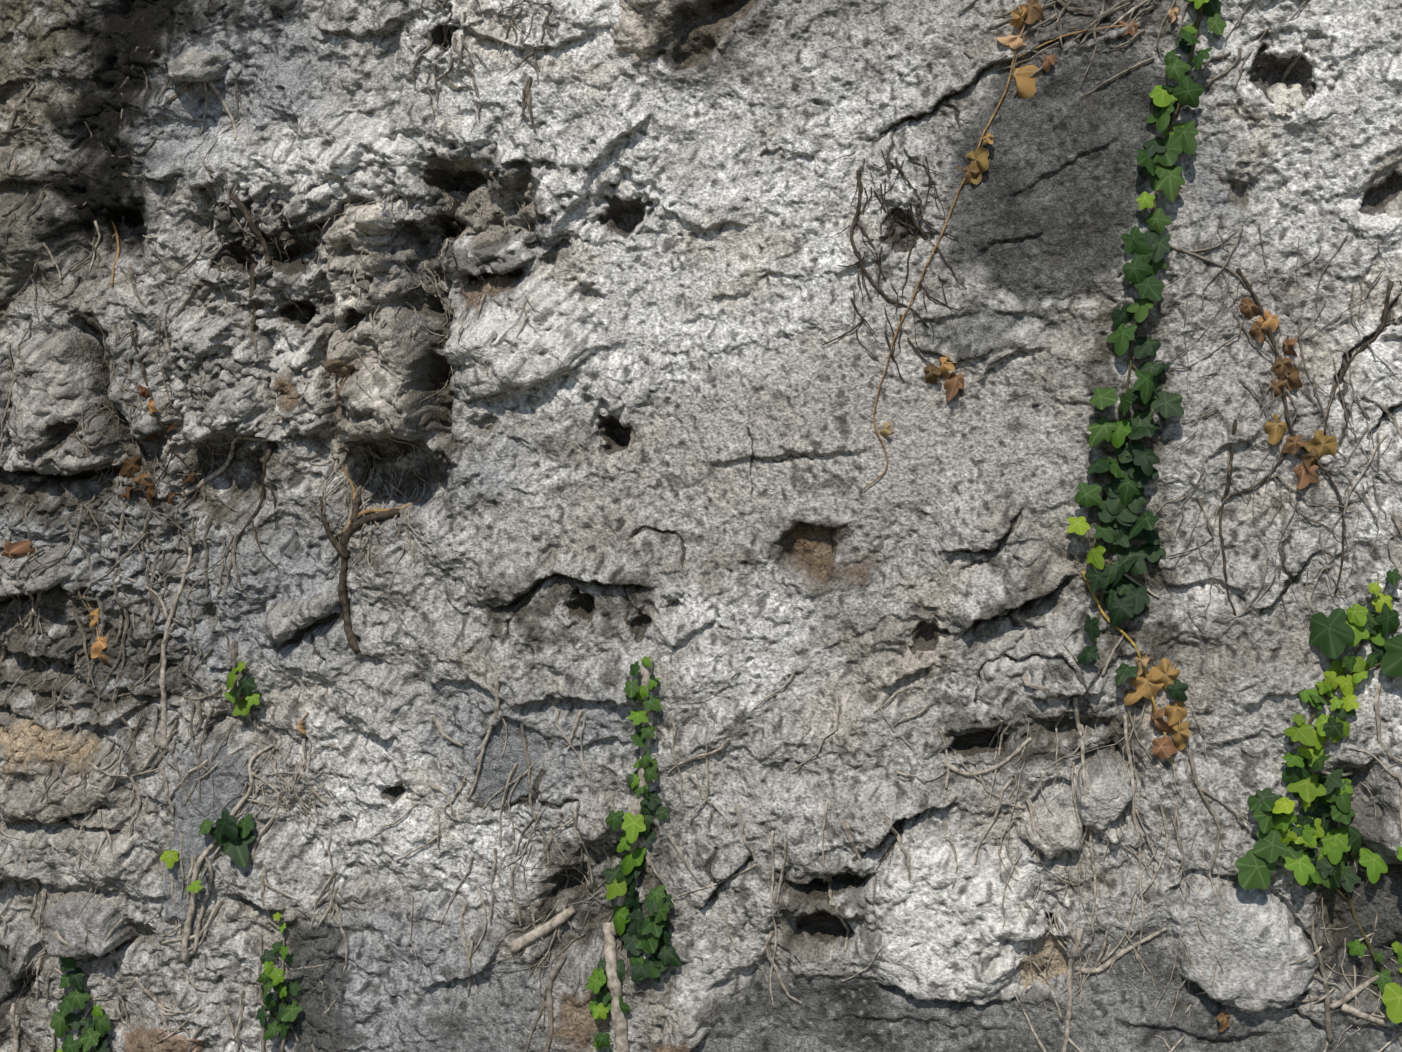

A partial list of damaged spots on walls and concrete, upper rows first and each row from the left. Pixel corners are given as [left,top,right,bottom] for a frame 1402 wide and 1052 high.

crack [866,62,996,181]